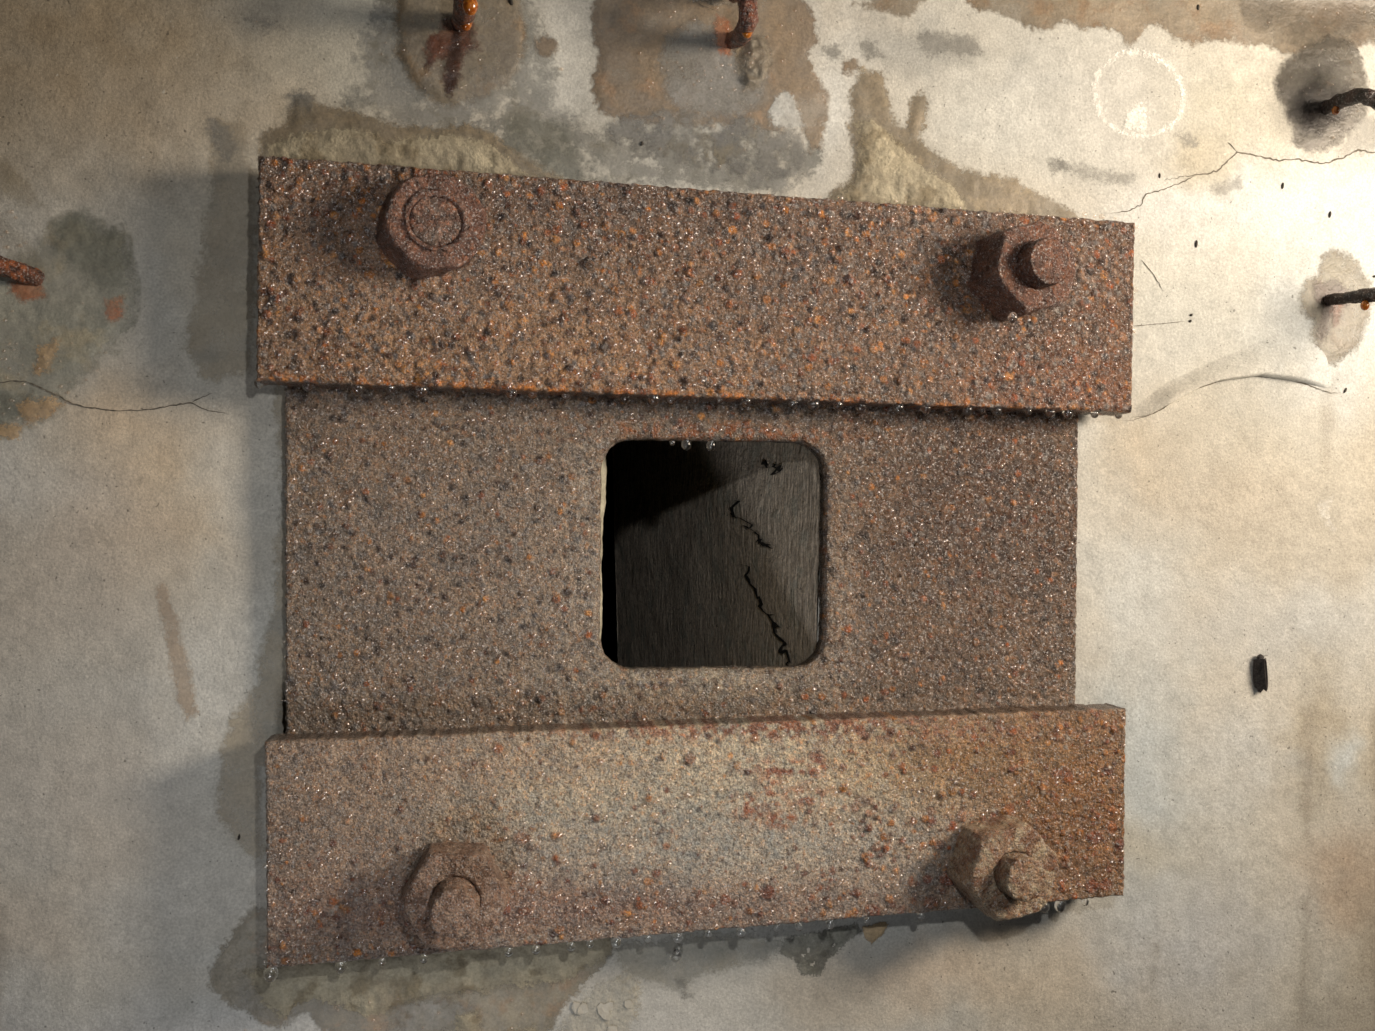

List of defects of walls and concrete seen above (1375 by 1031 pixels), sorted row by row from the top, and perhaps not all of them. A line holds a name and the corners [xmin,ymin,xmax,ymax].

damp [868,0,925,16]
rust [425,19,478,94]
damp [363,0,874,194]
damp [967,0,1375,151]
crack [1114,143,1375,213]
damp [1301,251,1372,366]
crack [0,380,226,414]
spalling [209,907,642,1031]
spalling [779,922,889,977]